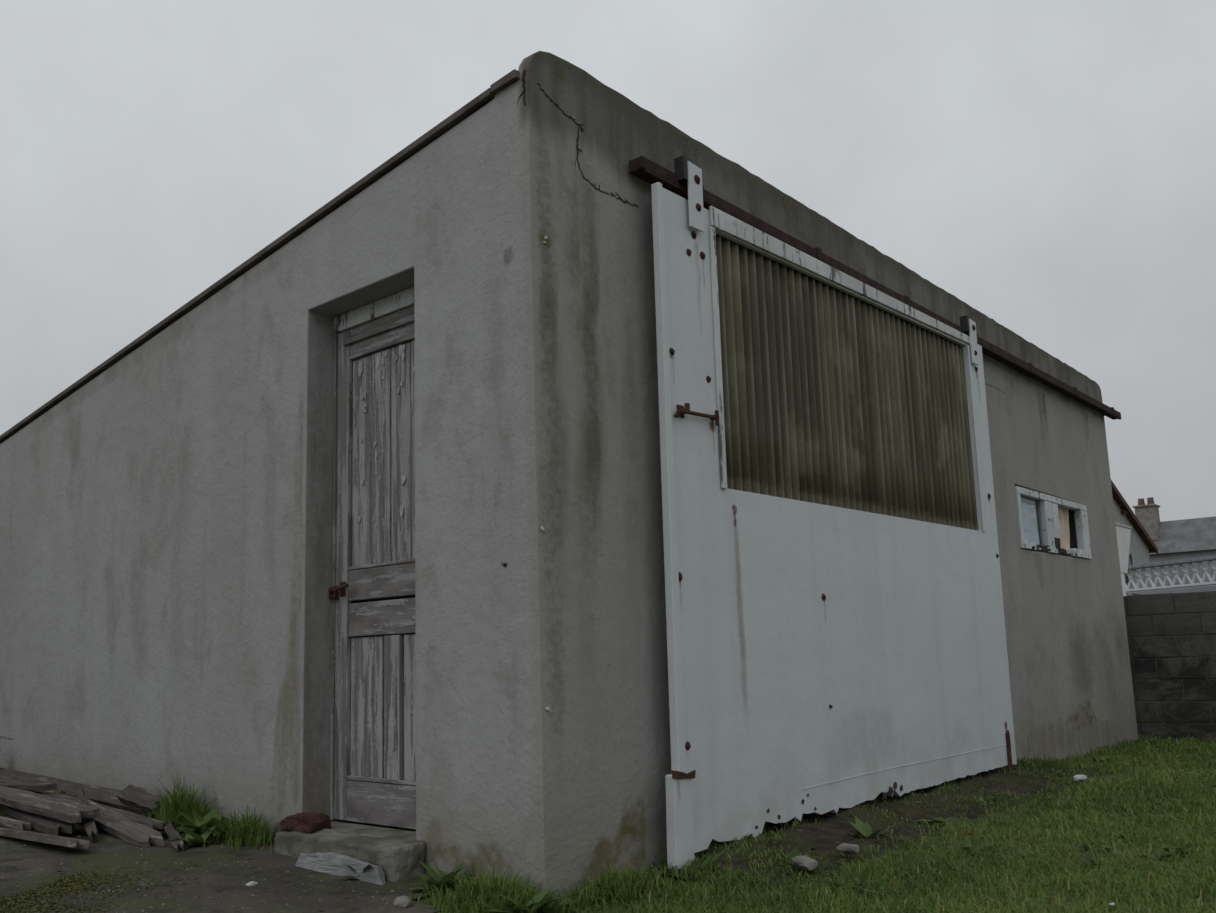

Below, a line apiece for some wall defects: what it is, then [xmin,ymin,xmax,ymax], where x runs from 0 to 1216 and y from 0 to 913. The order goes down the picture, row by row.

crack [517,69,639,207]